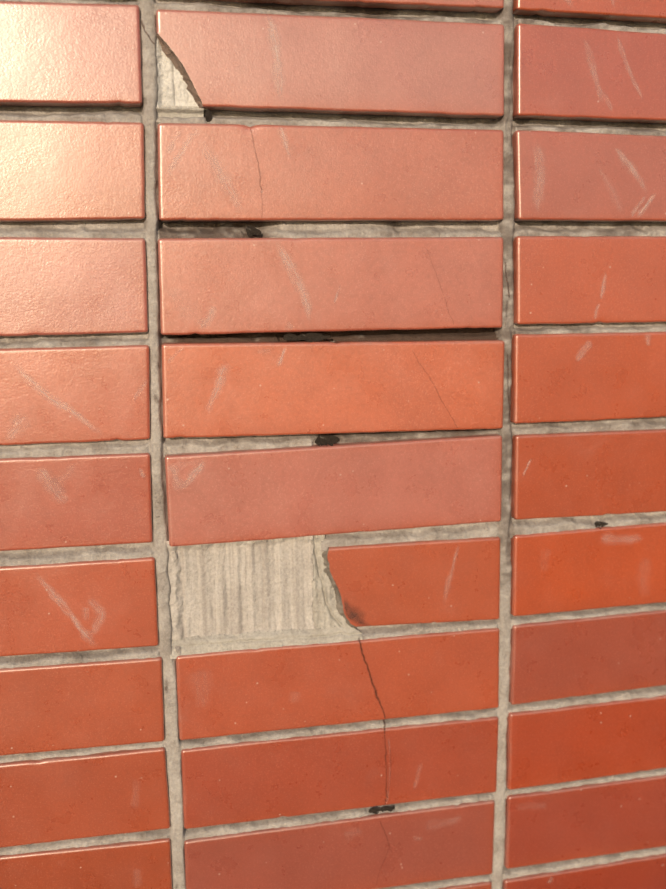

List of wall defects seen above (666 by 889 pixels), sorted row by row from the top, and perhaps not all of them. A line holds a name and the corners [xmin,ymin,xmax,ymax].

spalling [156,33,208,123]
spalling [166,535,363,659]
crack [359,640,387,802]